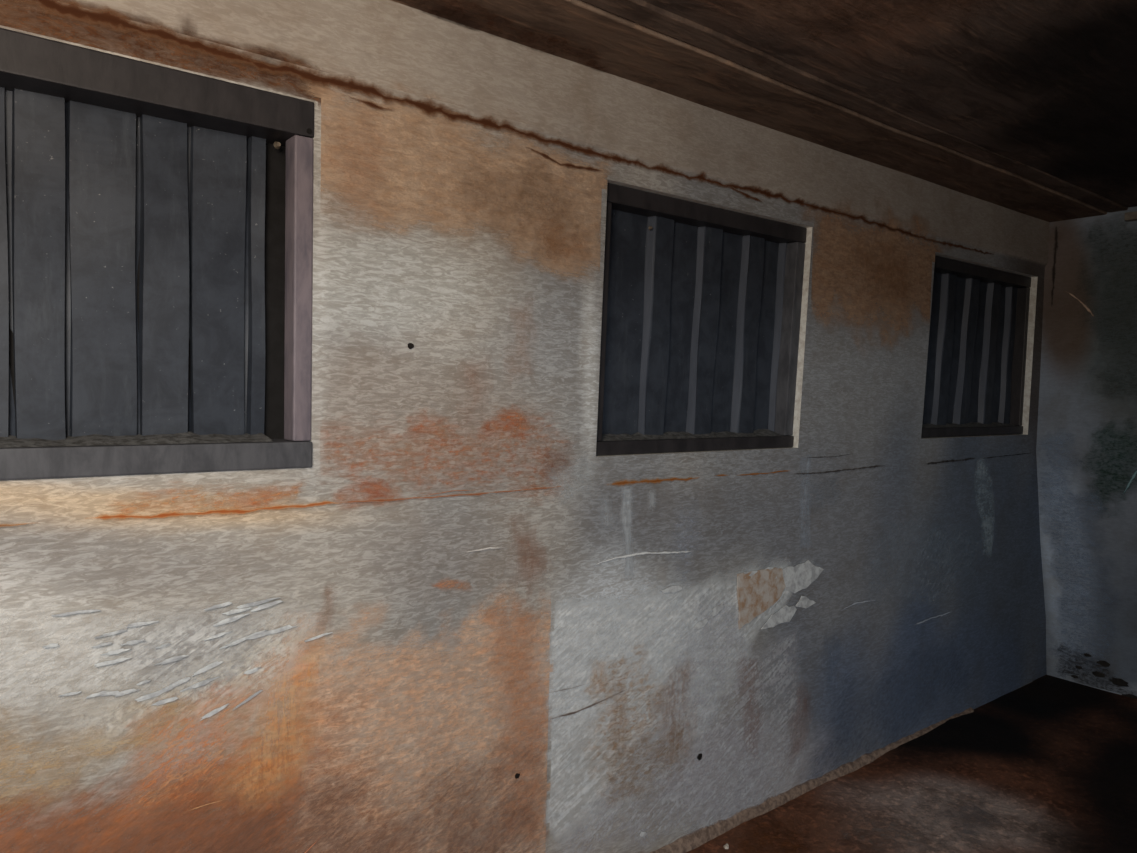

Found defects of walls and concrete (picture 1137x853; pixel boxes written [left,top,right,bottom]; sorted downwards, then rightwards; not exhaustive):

crack [18,0,992,254]
rust [0,666,414,853]
peeling [547,560,824,848]